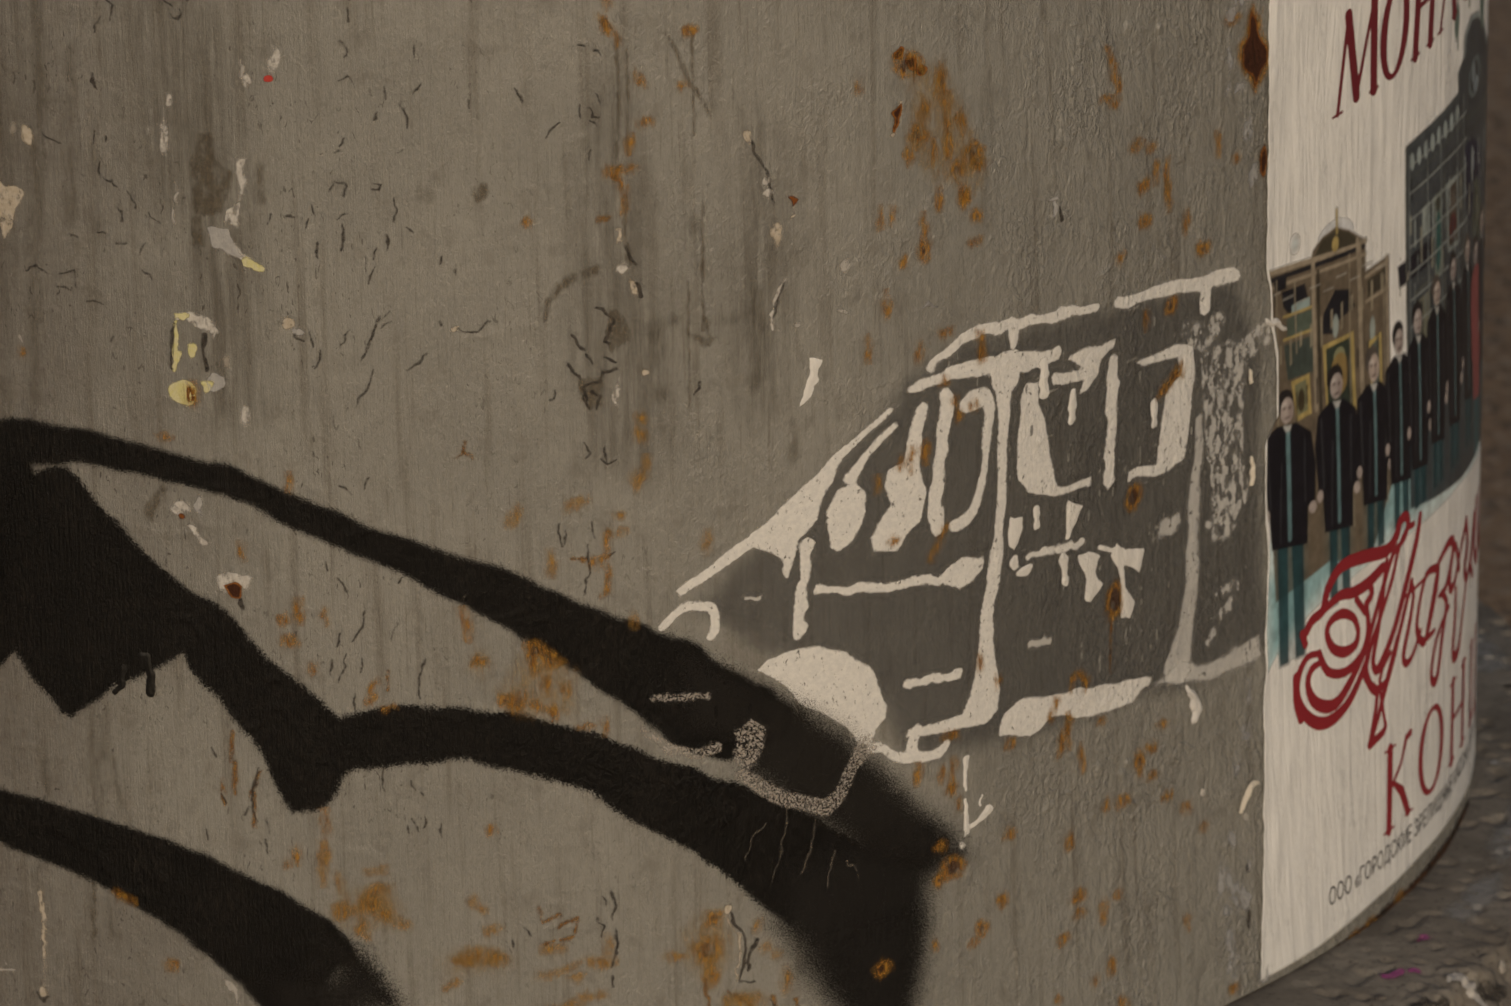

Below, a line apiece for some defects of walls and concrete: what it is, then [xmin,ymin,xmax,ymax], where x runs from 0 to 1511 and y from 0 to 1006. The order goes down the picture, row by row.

rust [1229,5,1268,91]
peeling [11,122,33,145]
rust [891,46,983,267]
peeling [0,182,24,238]
peeling [168,312,229,406]
peeling [240,406,251,424]
rust [499,640,570,718]
rust [674,912,798,1006]